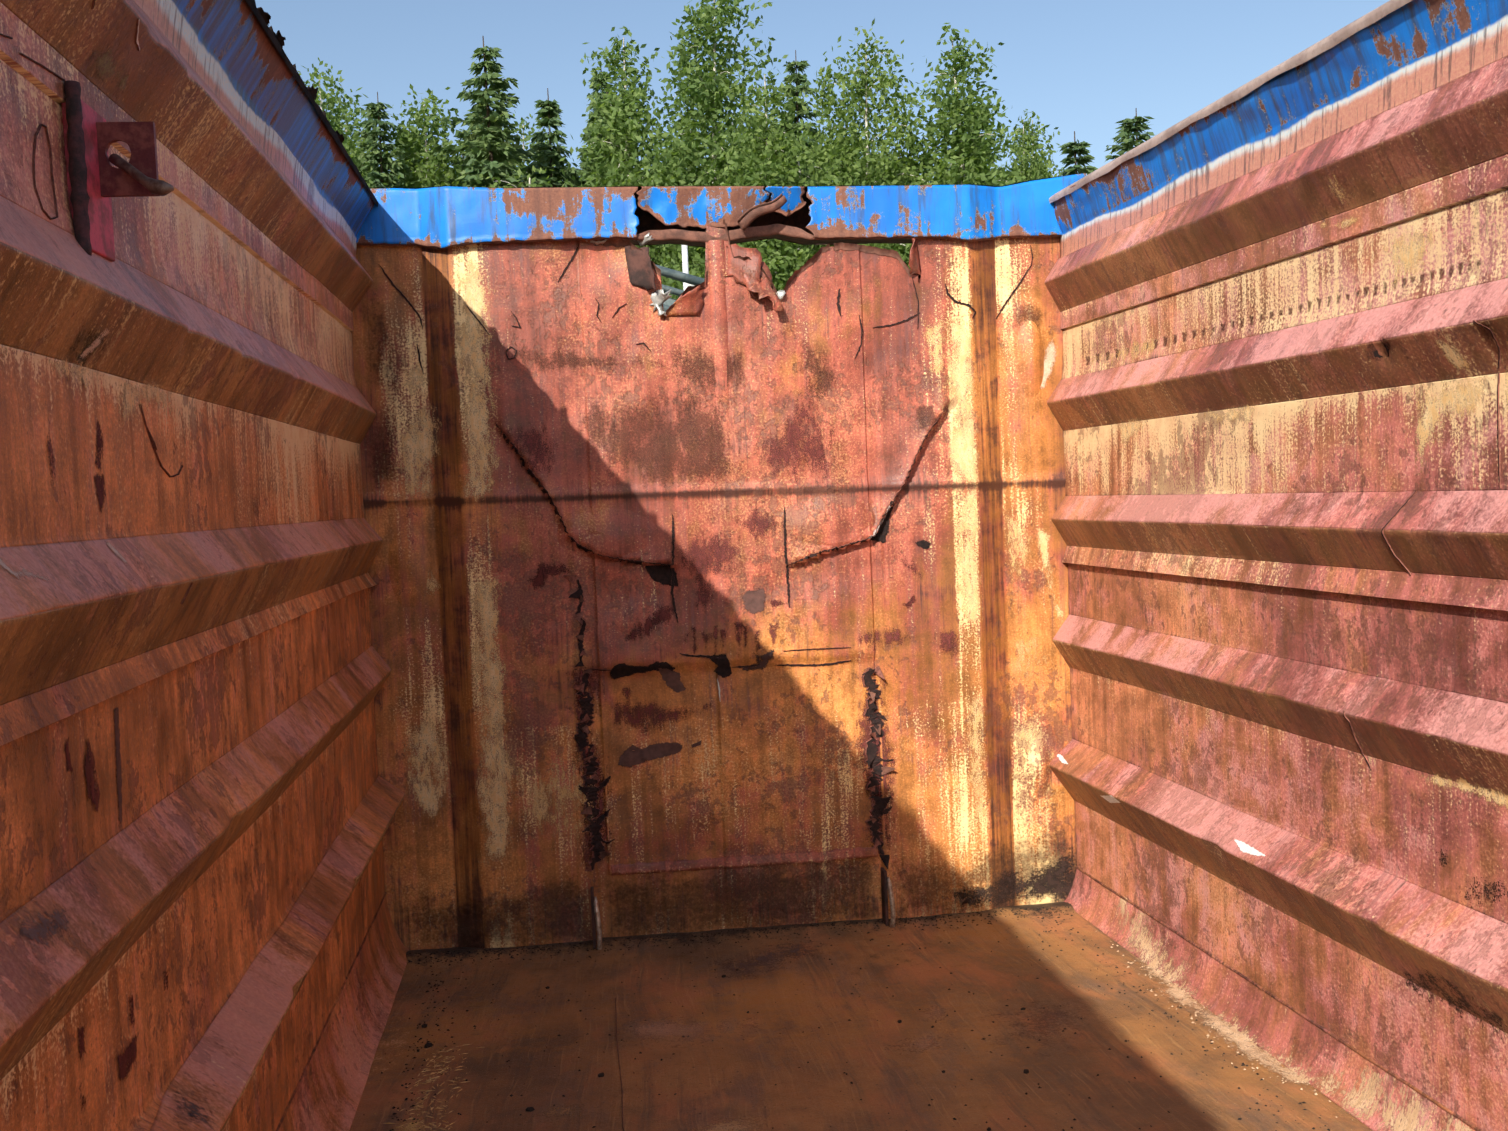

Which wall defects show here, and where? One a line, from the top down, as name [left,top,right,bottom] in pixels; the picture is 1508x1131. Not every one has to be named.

corrosion [94,421,106,512]
crack [783,406,947,607]
corrosion [680,507,778,655]
corrosion [903,540,931,577]
crack [495,422,897,872]
corrosion [859,628,903,650]
corrosion [940,629,958,657]
corrosion [610,687,711,735]
corrosion [65,708,122,823]
corrosion [1456,877,1508,911]
corrosion [118,995,137,1081]
corrosion [1399,968,1507,1037]